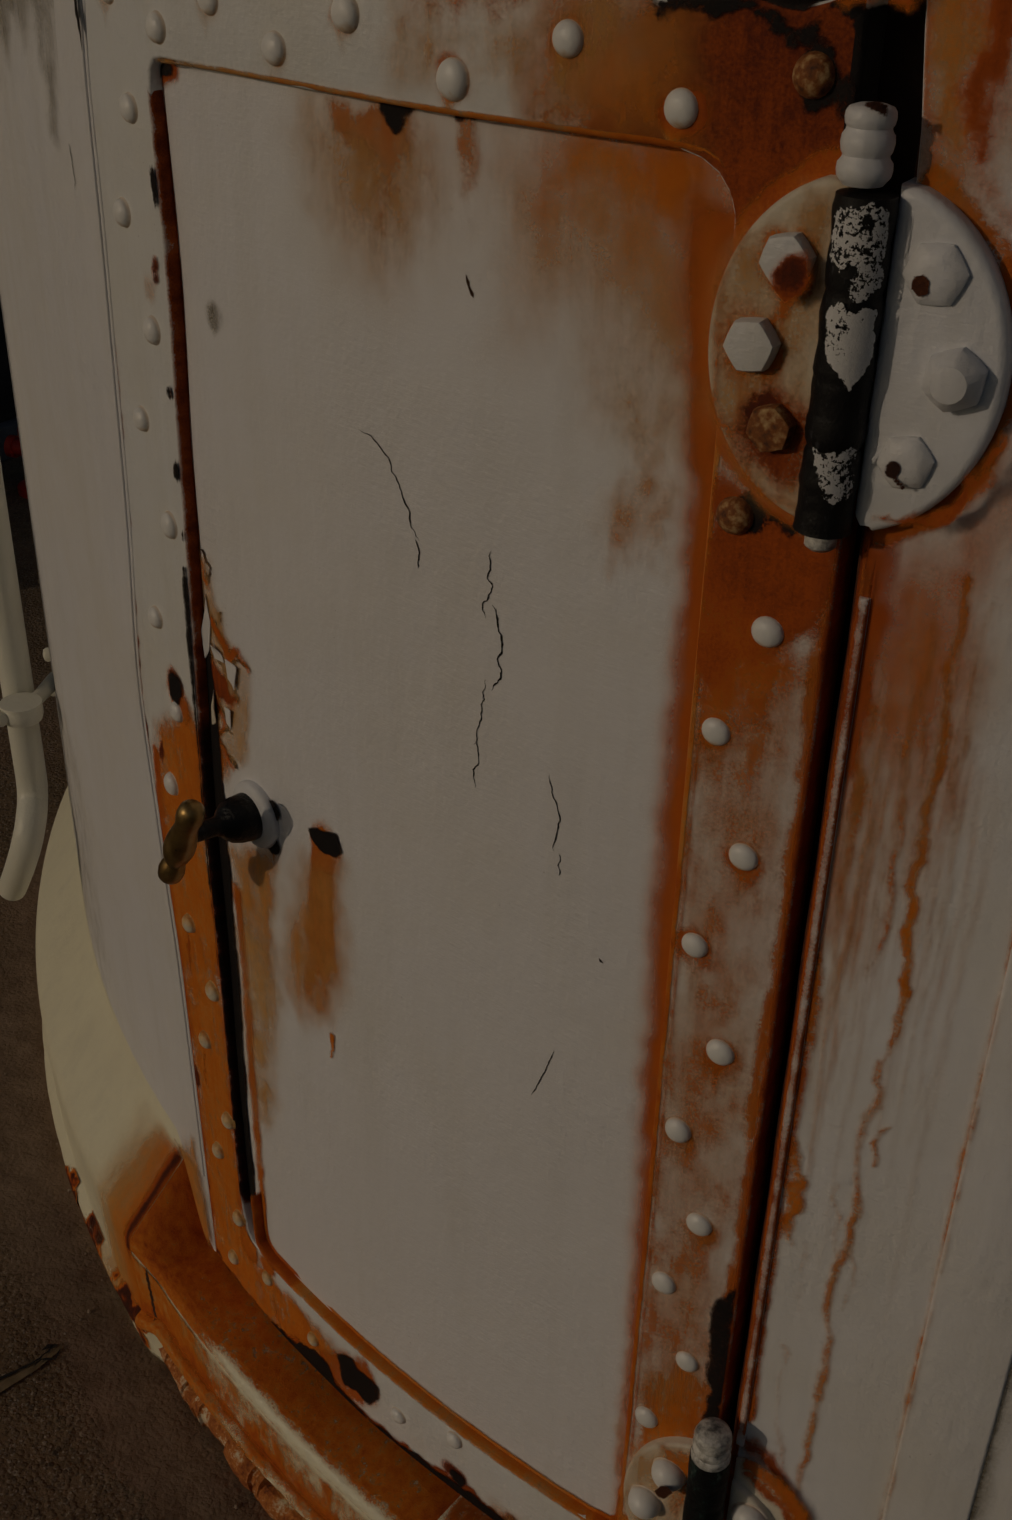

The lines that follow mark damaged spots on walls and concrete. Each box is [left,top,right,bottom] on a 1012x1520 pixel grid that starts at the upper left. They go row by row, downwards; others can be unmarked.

rust [890,0,915,11]
rust [918,0,1012,312]
peeling [825,202,890,392]
crack [361,431,420,567]
peeling [812,447,857,505]
peeling [885,461,905,490]
crack [472,552,503,783]
rust [102,0,889,1520]
rust [723,378,1012,1520]